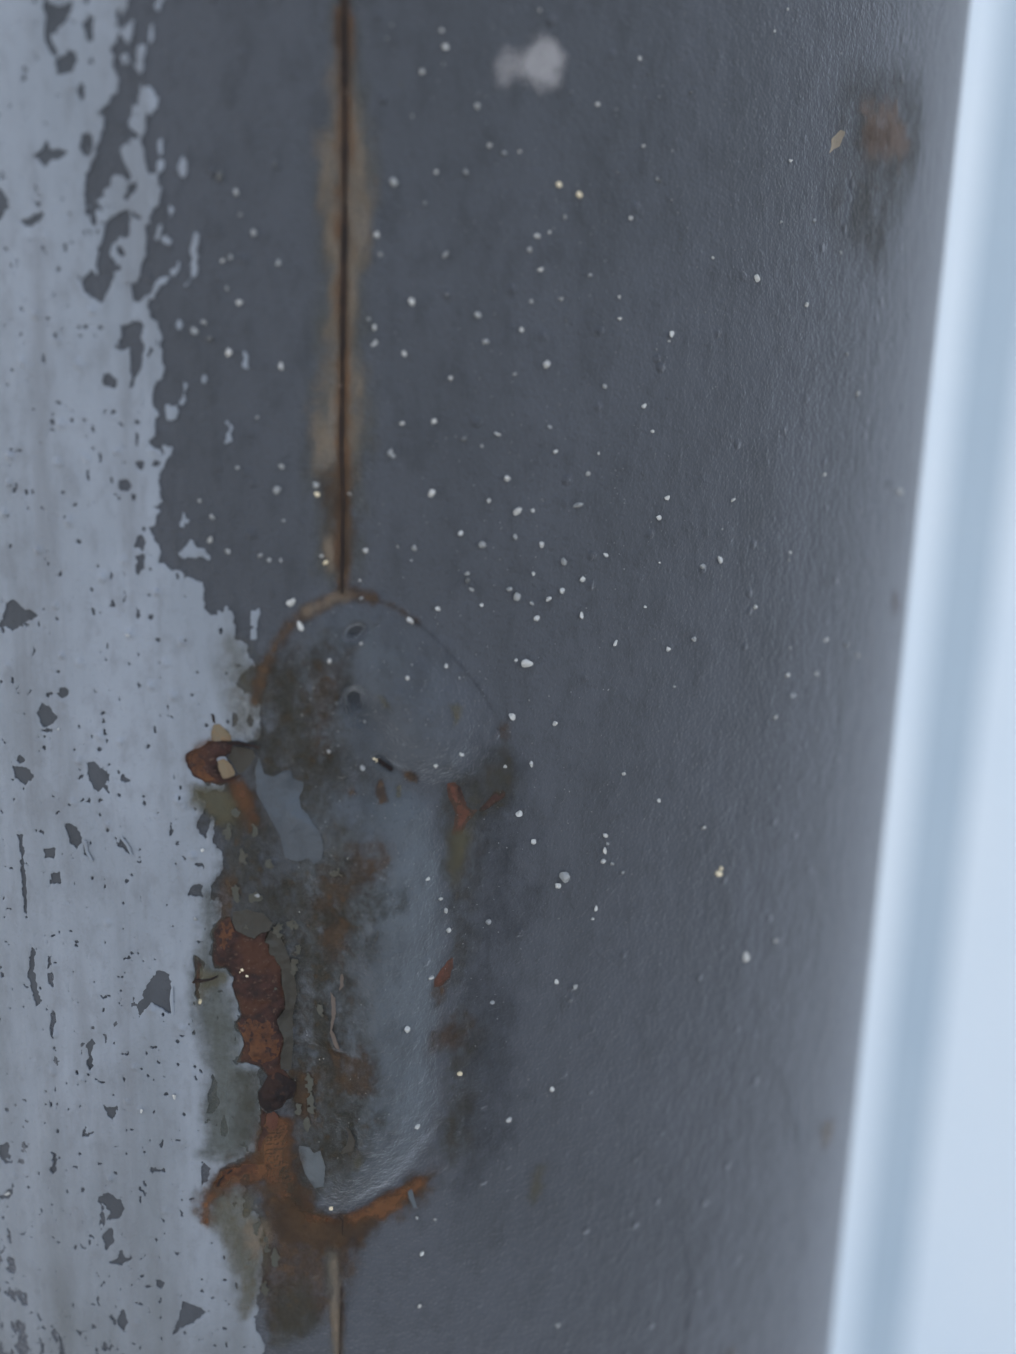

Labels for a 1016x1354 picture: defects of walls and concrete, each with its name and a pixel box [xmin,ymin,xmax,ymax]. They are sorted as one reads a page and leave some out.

peeling [43,0,95,75]
rust [829,130,845,153]
crack [339,0,349,594]
rust [241,75,417,705]
peeling [0,600,38,631]
peeling [87,761,110,792]
spalling [185,713,255,785]
rust [192,781,256,823]
peeling [137,970,174,1017]
spalling [194,910,297,1152]
rust [193,985,432,1249]
crack [336,1215,344,1354]